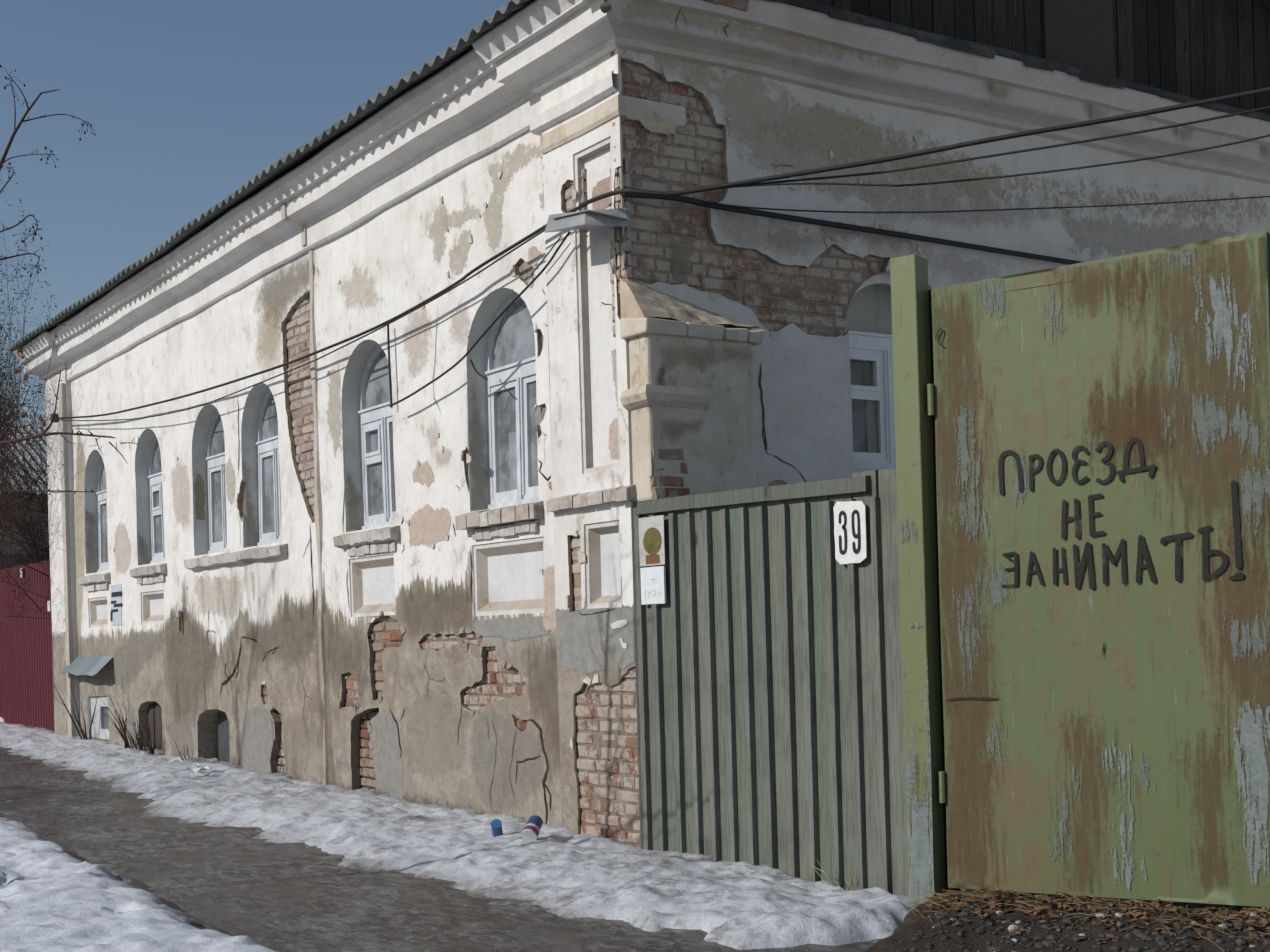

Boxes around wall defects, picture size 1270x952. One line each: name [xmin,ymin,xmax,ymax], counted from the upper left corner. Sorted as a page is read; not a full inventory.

spalling [702,0,749,11]
spalling [564,49,1269,459]
spalling [280,294,342,520]
crack [759,364,806,482]
spalling [650,448,690,514]
water stain [195,574,255,615]
crack [207,611,279,693]
spalling [338,611,406,790]
spalling [421,627,527,716]
crack [457,716,551,823]
spalling [570,666,641,849]